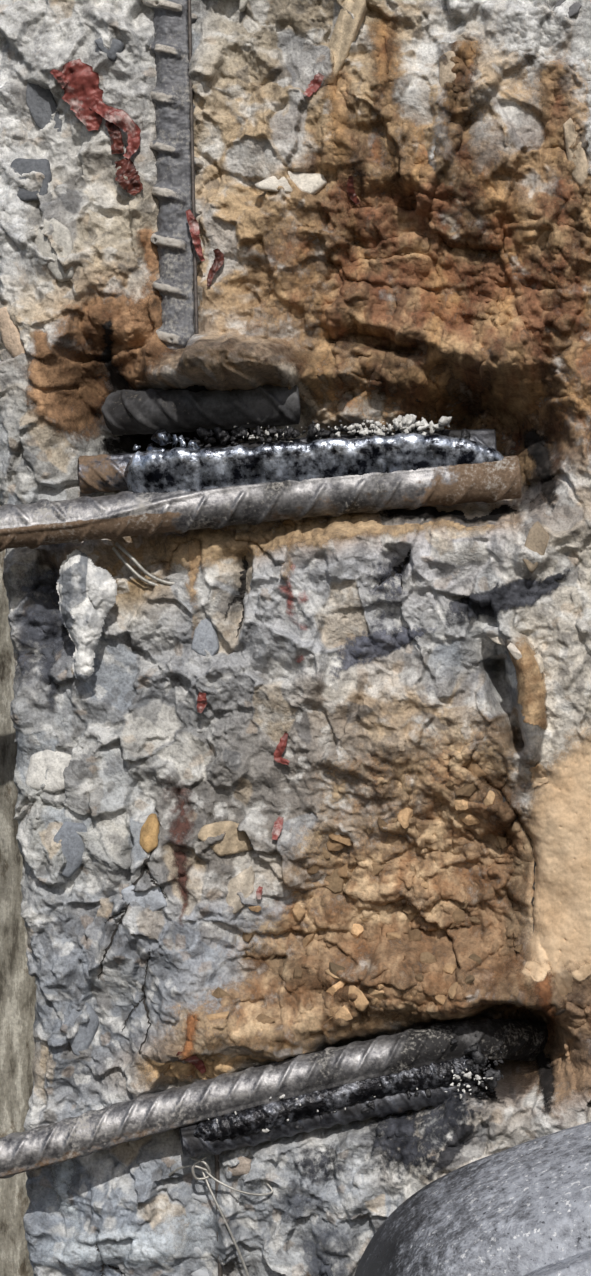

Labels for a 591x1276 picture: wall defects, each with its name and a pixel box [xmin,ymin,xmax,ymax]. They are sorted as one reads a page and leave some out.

corrosion [246,13,591,486]
corrosion [25,228,175,435]
spalling [101,384,300,435]
peeling [56,549,117,683]
crack [98,851,166,979]
corrosion [165,787,193,921]
spalling [172,731,591,1046]
crack [122,949,151,1054]
corrosion [140,1014,283,1081]
corrosion [509,966,591,1105]